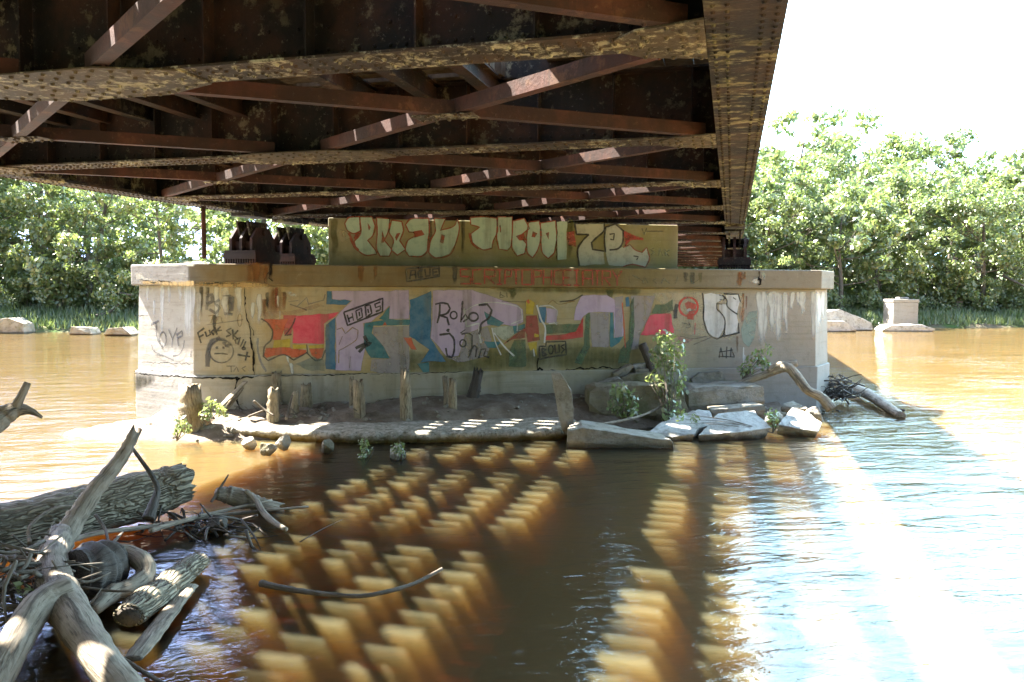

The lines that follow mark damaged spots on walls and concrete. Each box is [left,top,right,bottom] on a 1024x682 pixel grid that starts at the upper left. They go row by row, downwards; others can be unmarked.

crack [134,262,461,409]
leakage [756,292,825,338]